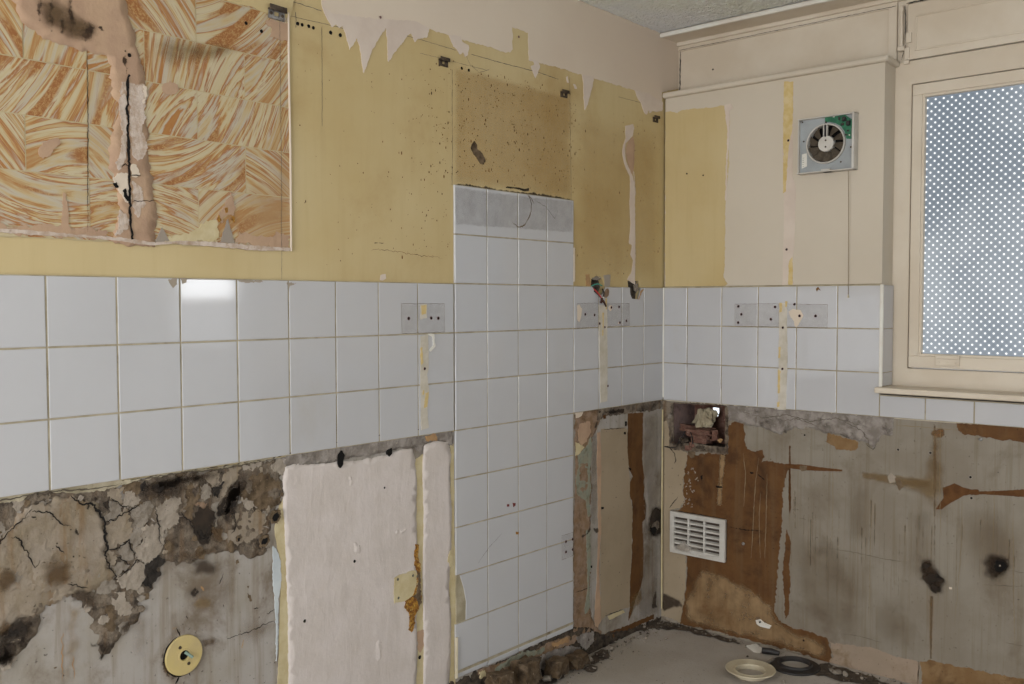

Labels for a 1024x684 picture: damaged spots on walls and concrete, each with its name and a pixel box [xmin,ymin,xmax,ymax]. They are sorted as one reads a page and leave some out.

water stain [37,3,103,41]
peeling [112,82,148,236]
crack [113,74,156,240]
crack [0,496,193,580]
spalling [0,458,286,671]
water stain [145,473,214,498]
water stain [182,480,247,573]
flaking render [449,400,1024,684]
water stain [0,620,29,667]